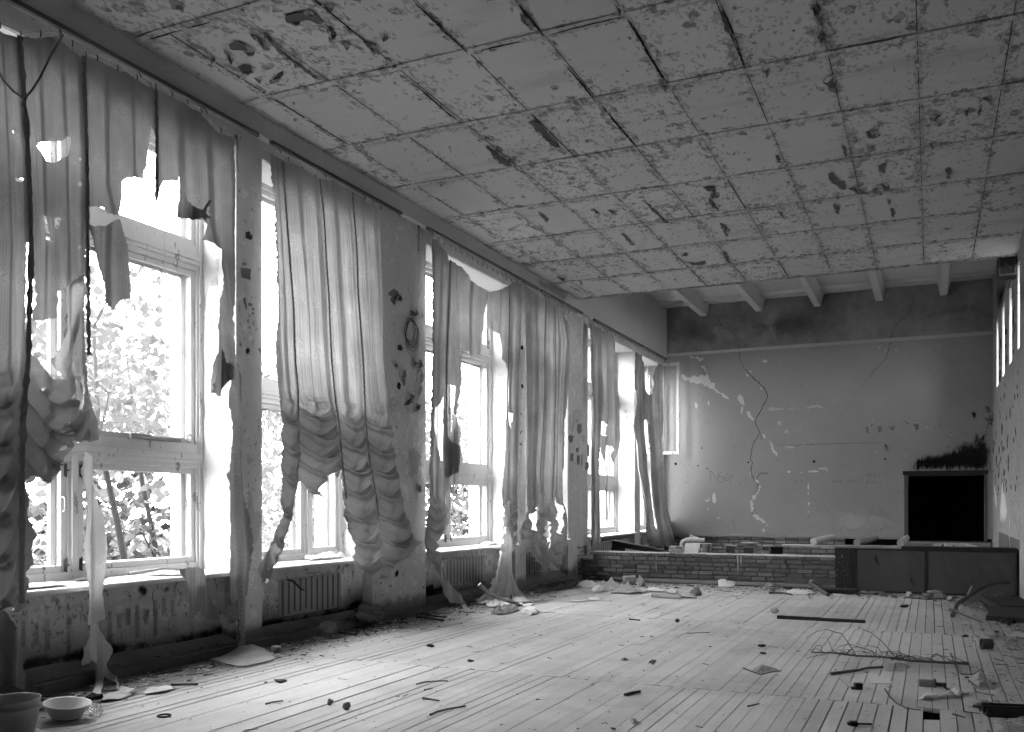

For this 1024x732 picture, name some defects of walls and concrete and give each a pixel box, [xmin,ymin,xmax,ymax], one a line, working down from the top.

peeling [72,0,1024,300]
spalling [681,355,754,420]
spalling [750,473,768,532]
crack [717,316,879,516]